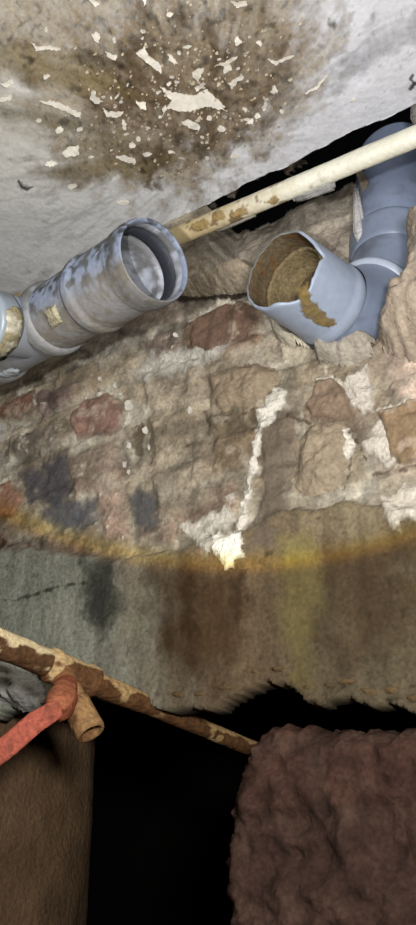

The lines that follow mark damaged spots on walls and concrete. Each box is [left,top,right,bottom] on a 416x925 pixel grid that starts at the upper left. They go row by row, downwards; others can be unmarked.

peeling [31,42,61,51]
peeling [0,78,14,102]
damp [0,0,324,193]
peeling [39,0,294,177]
spalling [293,182,336,202]
spalling [353,188,364,242]
spalling [188,298,255,351]
spalling [0,388,36,417]
spalling [71,377,133,438]
spalling [126,425,150,456]
spalling [306,374,351,420]
spalling [376,394,416,463]